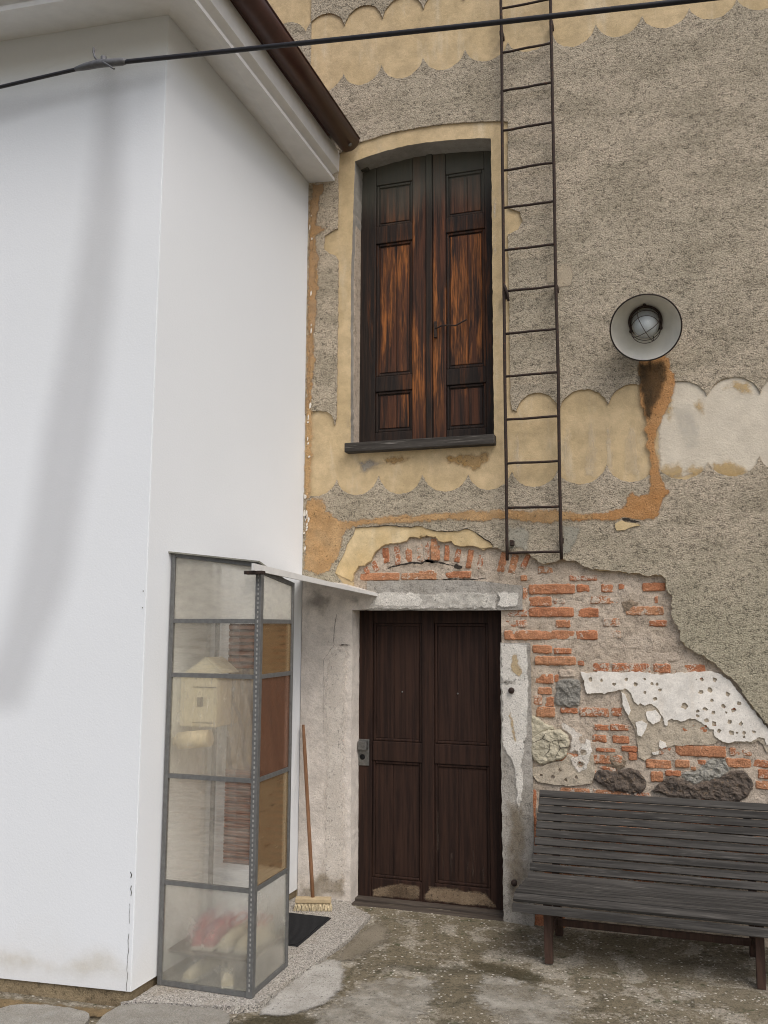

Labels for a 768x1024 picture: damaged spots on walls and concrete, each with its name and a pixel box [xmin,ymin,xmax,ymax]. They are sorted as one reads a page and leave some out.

corrosion [304,184,675,574]
crack [388,559,486,580]
spalling [335,526,768,893]
spalling [562,906,749,941]